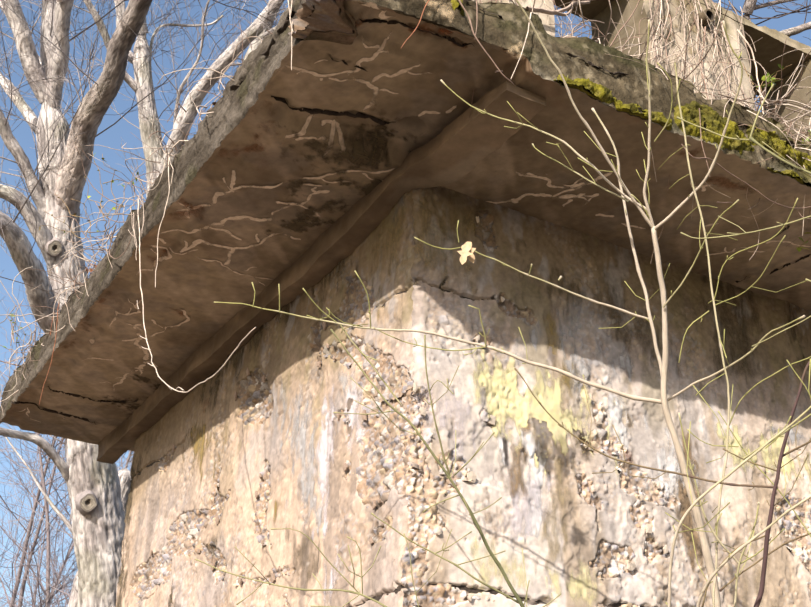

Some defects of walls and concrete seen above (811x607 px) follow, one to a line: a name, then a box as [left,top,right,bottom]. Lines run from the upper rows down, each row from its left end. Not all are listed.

spalling [288,0,354,39]
crack [271,96,391,125]
crack [382,279,494,307]
crack [11,386,143,423]
spalling [234,367,274,425]
spalling [309,276,497,607]
spalling [575,400,681,579]
spalling [129,460,296,604]
crack [349,583,408,607]
crack [430,584,547,604]
crack [606,599,642,607]